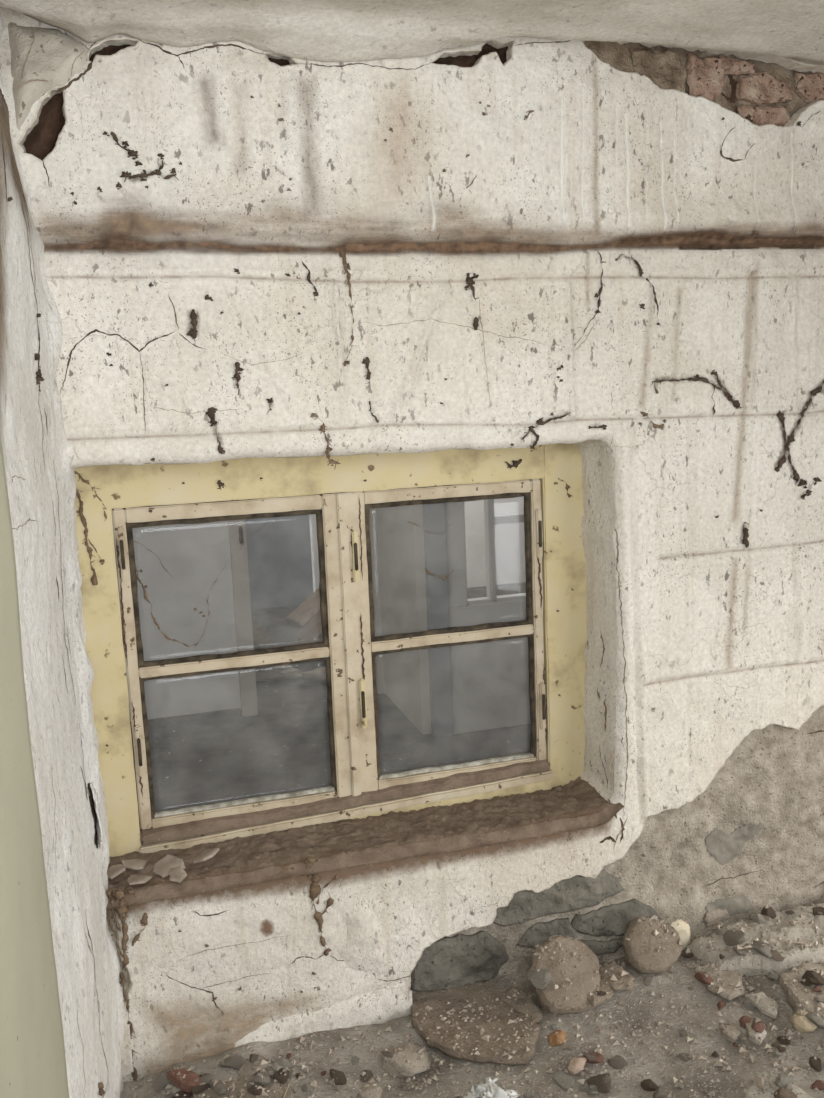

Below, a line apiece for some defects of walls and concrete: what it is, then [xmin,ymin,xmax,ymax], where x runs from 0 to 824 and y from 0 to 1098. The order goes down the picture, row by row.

flaking render [582,41,824,128]
crack [1,33,571,370]
crack [12,297,298,541]
crack [56,572,91,806]
peeling [116,538,128,665]
peeling [350,499,363,578]
flaking render [409,705,824,1001]
crack [77,919,109,1097]
crack [166,936,344,1009]